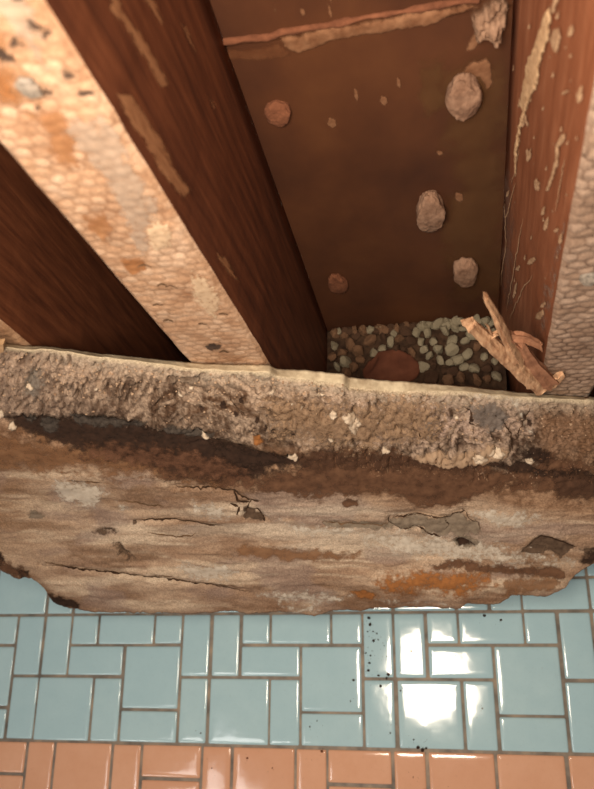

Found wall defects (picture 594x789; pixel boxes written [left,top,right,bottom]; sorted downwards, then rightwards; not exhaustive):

peeling [228,4,476,60]
corrosion [41,112,77,168]
corrosion [122,259,146,275]
spalling [220,388,532,469]
damp [0,412,594,508]
crack [121,485,265,538]
damp [238,530,525,564]
peeling [323,508,481,546]
spalling [522,535,594,558]
crack [41,562,248,591]
corrosion [351,559,565,600]
damp [264,590,341,613]